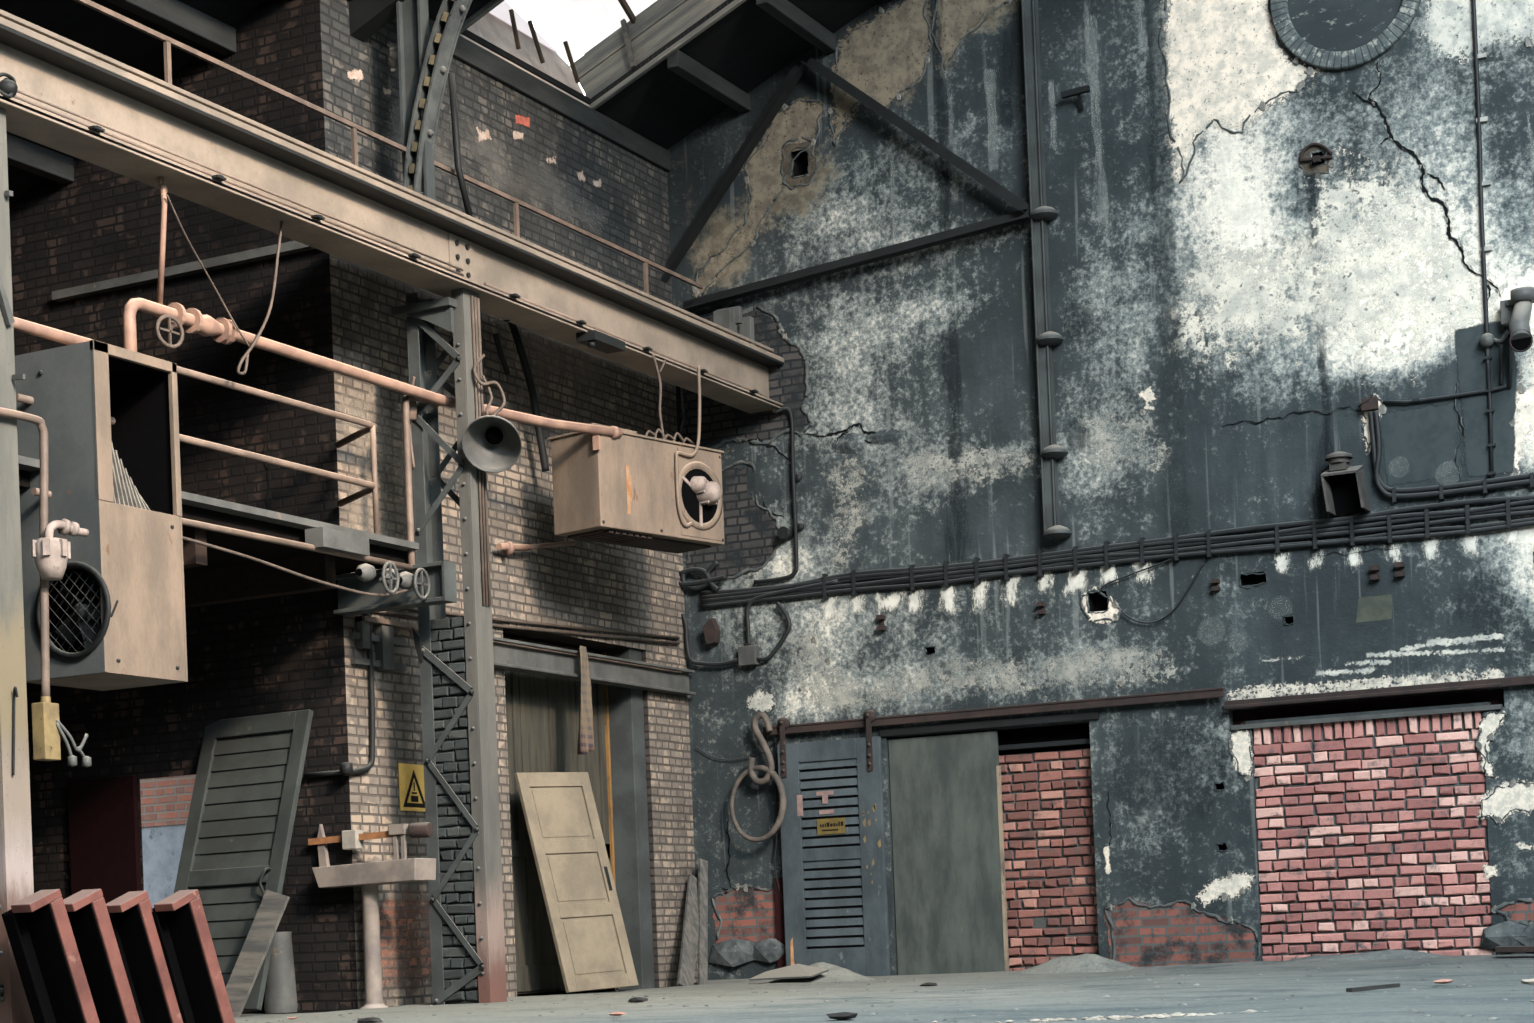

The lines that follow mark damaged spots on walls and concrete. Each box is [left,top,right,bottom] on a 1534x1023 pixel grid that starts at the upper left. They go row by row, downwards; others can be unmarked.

peeling [1156,0,1321,185]
peeling [691,0,1019,298]
crack [1353,60,1501,299]
spalling [679,306,813,588]
peeling [904,446,1034,490]
spalling [1239,553,1287,589]
peeling [1349,548,1359,566]
peeling [1424,538,1439,560]
peeling [1227,633,1505,700]
peeling [1475,711,1534,824]
peeling [1103,846,1111,875]
spalling [1103,871,1262,967]